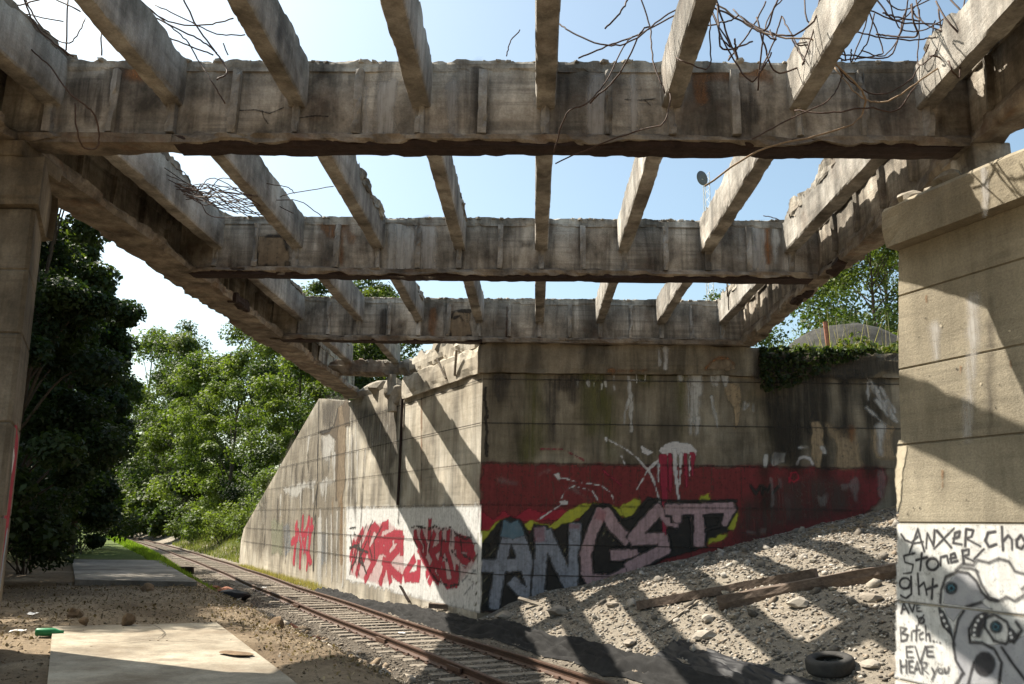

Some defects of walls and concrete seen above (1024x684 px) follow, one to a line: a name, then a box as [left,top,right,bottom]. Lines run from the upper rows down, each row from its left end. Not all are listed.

spalling [164,167,265,219]
damp [547,374,650,441]
damp [679,375,728,434]
damp [745,351,900,540]